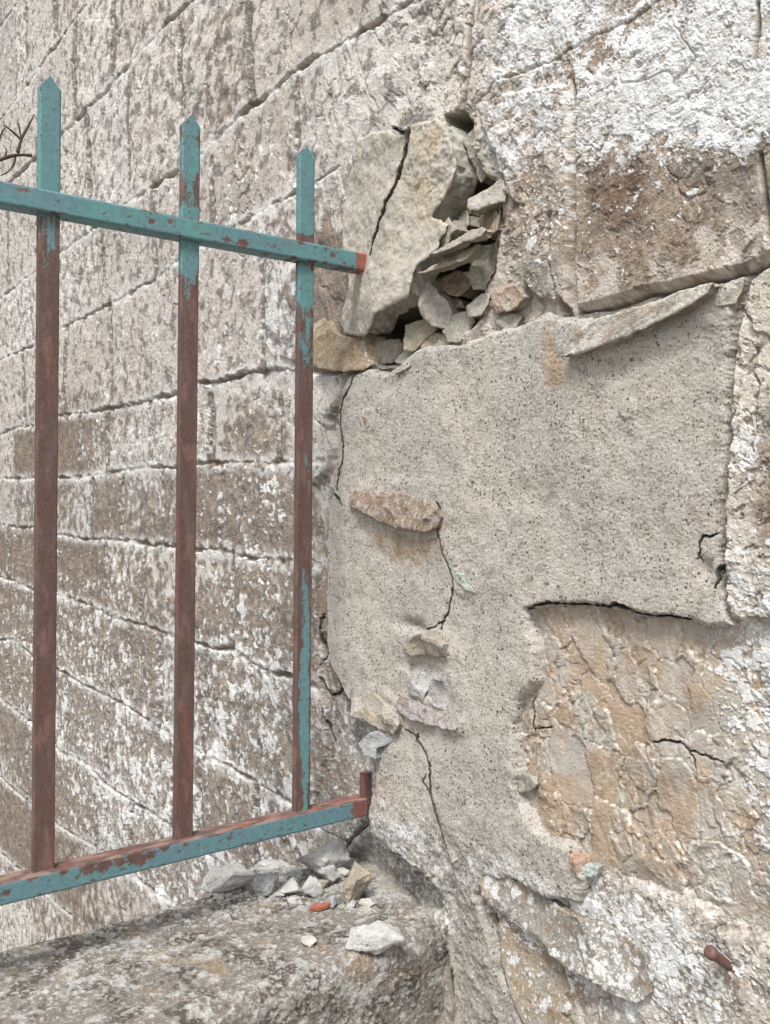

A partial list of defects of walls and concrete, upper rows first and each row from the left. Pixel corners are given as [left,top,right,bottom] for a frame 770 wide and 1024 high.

spalling [443,108,476,133]
crack [369,125,411,255]
spalling [470,146,498,197]
spalling [436,263,471,279]
spalling [463,203,503,293]
spalling [364,306,423,347]
crack [333,374,357,506]
crack [427,502,454,630]
crack [528,601,692,620]
crack [405,729,447,850]
spalling [521,605,770,931]
crack [654,739,724,768]